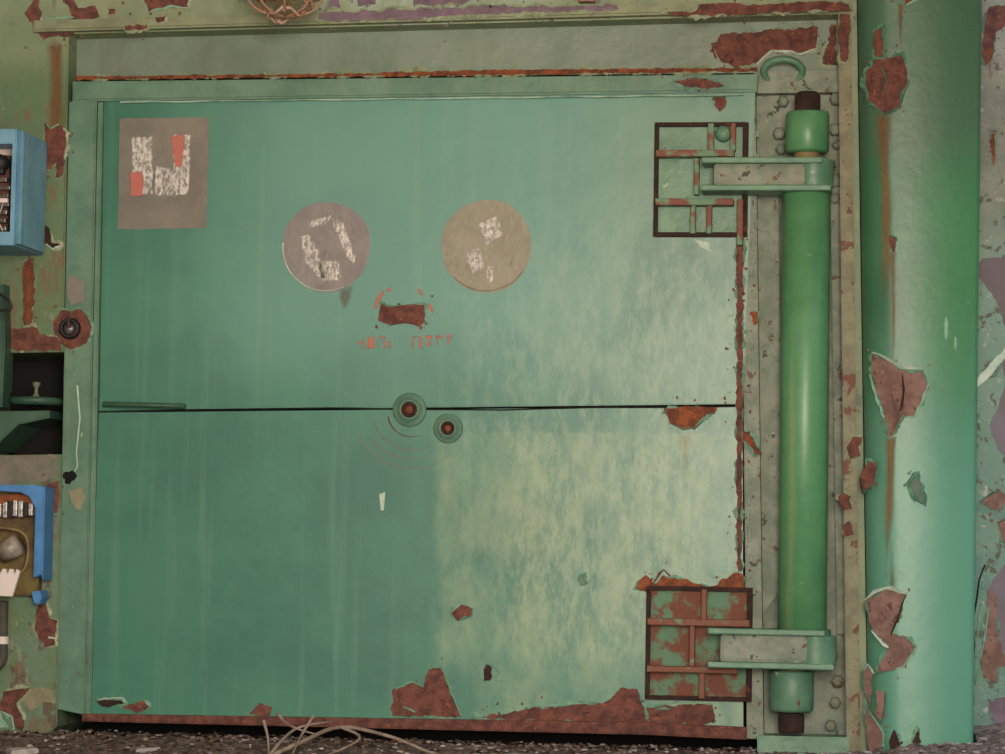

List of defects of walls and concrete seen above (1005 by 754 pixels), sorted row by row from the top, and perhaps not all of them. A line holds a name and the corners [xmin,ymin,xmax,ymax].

corrosion [24,0,117,181]
corrosion [76,64,758,112]
peeling [311,0,631,30]
peeling [703,20,839,71]
peeling [859,23,914,257]
corrosion [11,256,94,353]
corrosion [372,295,434,333]
corrosion [631,234,762,596]
peeling [845,347,941,531]
peeling [0,680,57,731]
corrosion [381,657,721,732]
peeling [851,578,921,752]